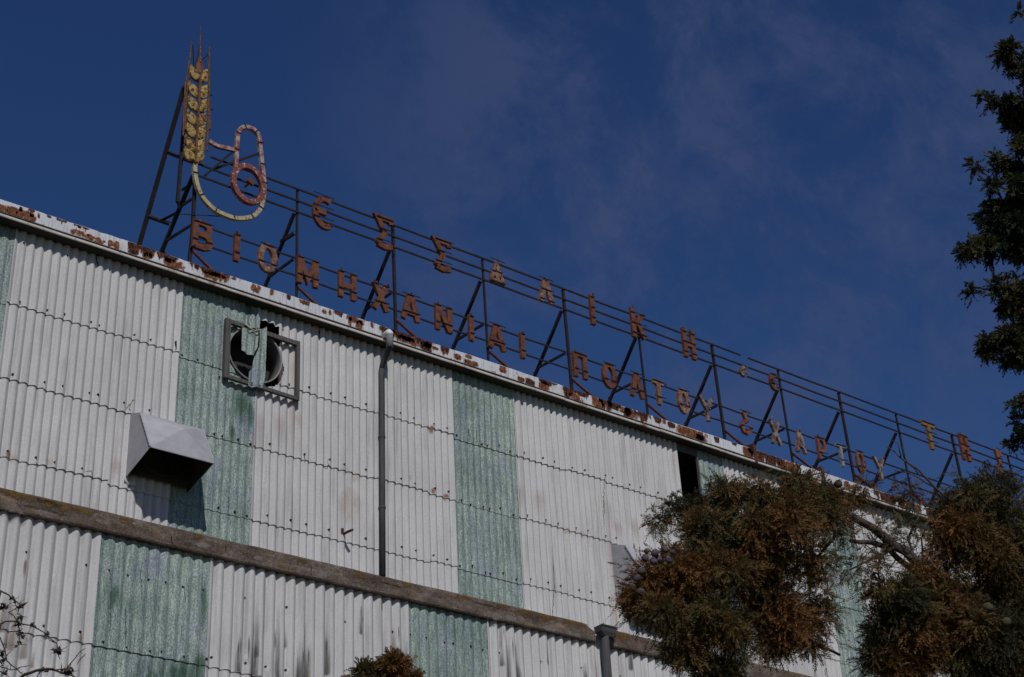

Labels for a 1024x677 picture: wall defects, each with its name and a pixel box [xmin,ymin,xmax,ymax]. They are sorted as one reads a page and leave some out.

corrosion [0,204,236,283]
corrosion [322,309,479,367]
corrosion [518,376,719,443]
corrosion [732,442,801,471]
corrosion [873,490,934,517]
leakage [237,642,309,677]